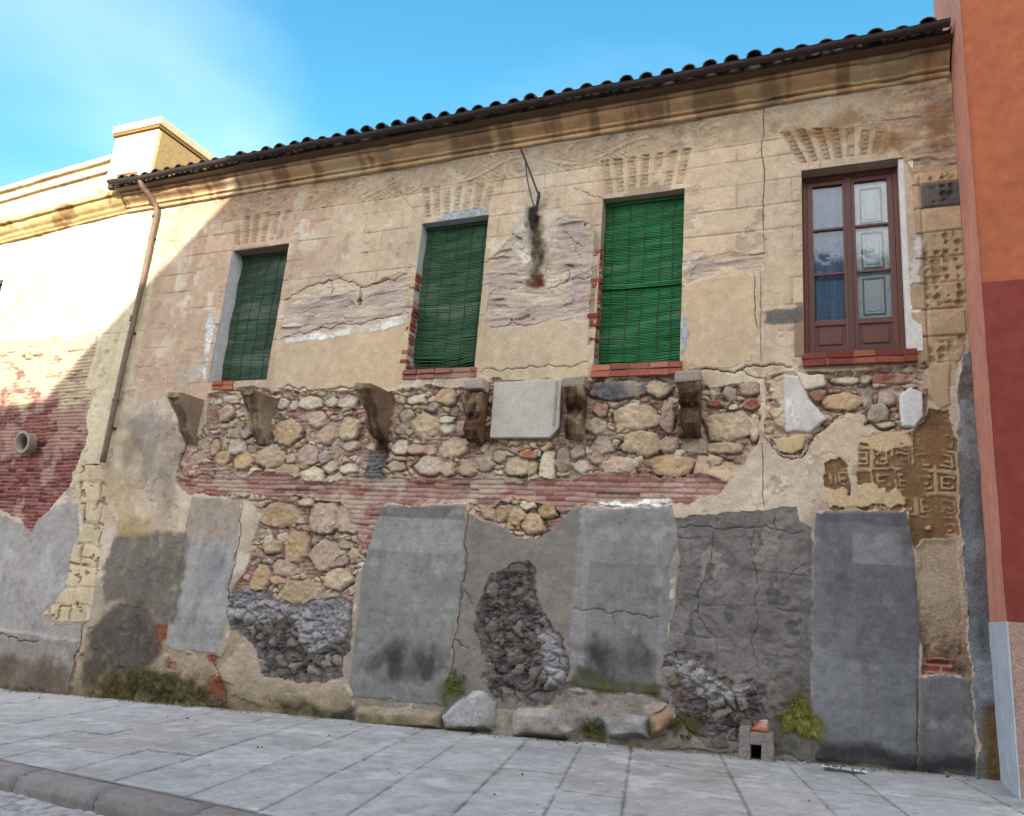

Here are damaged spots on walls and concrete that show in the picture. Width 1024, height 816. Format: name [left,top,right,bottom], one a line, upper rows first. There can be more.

leakage [511,206,573,283]
leakage [682,254,704,270]
crack [696,108,789,379]
spalling [0,78,974,751]
crack [573,608,652,621]
crack [679,409,864,669]